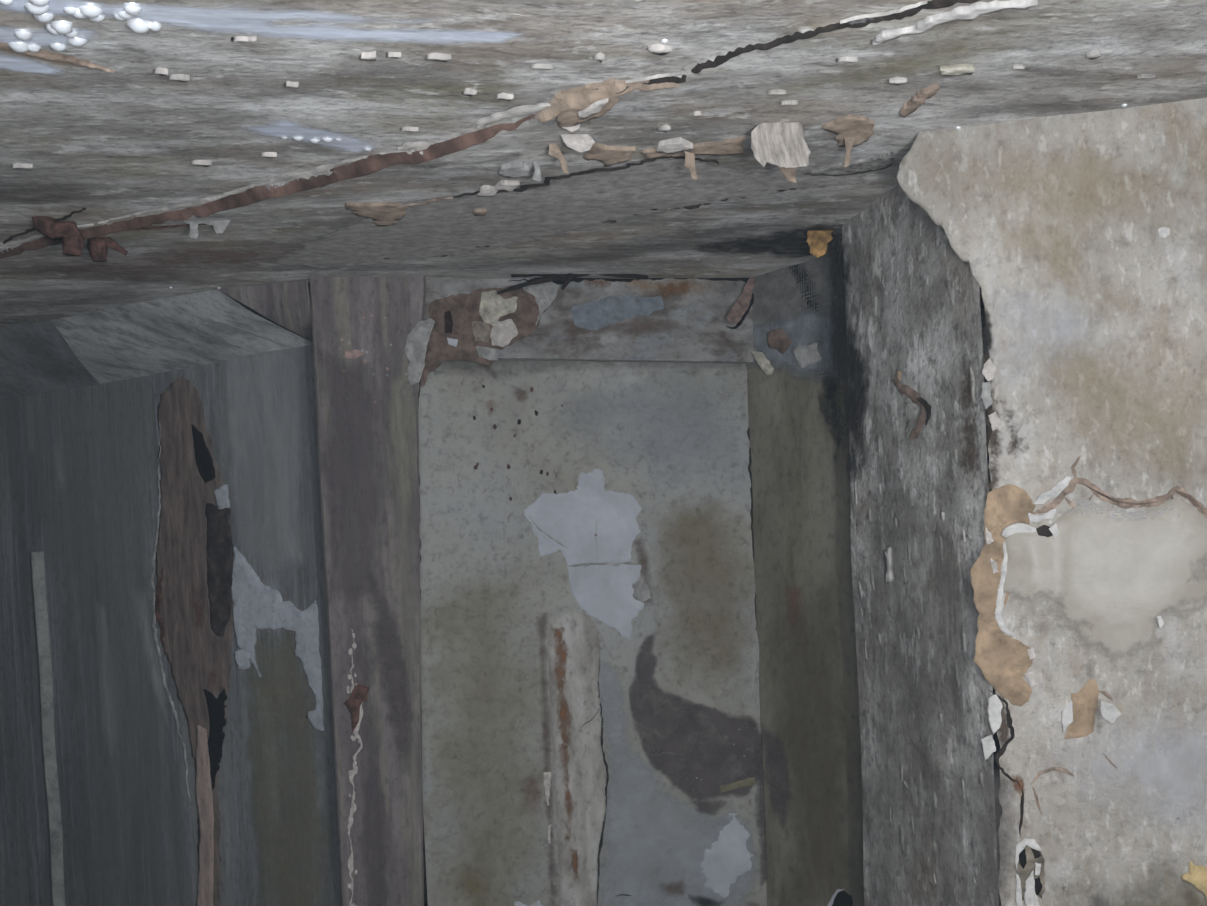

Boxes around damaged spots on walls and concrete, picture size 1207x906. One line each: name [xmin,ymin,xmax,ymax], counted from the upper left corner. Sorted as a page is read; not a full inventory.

leakage [0,0,518,74]
crack [0,0,980,259]
spalling [390,282,559,401]
crack [509,277,749,285]
spalling [155,376,324,906]
crack [347,729,363,906]
rust [554,629,573,815]
peeling [524,468,651,642]
leakage [601,636,789,906]
spalling [955,484,1037,707]
crack [981,690,1075,836]
spalling [1015,838,1045,906]